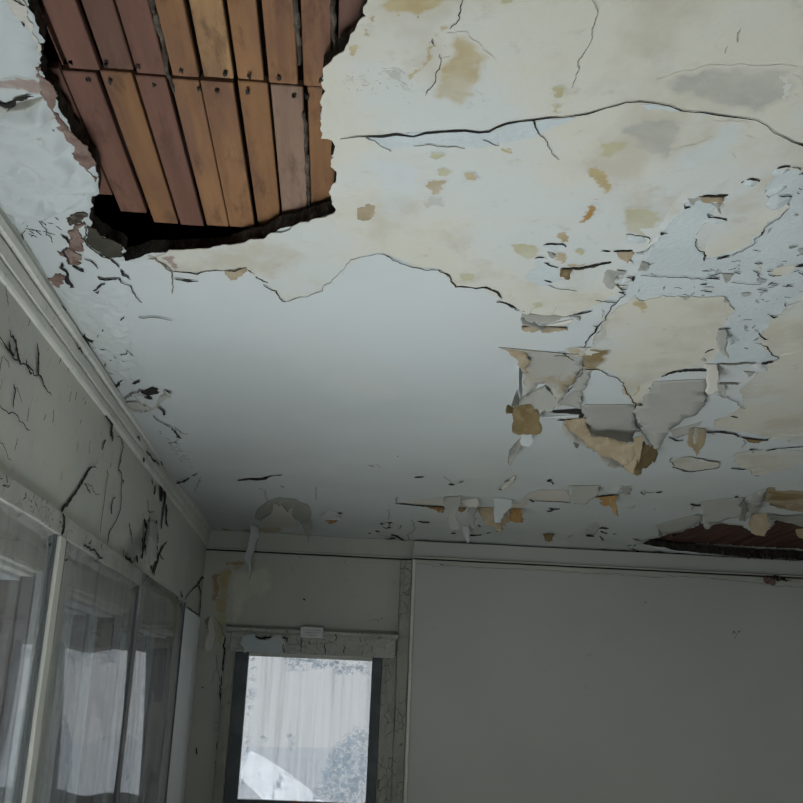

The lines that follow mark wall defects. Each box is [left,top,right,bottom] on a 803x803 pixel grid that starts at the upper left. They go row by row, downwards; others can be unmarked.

leakage [362,0,464,38]
leakage [346,25,494,110]
crack [572,0,598,87]
spalling [0,62,97,182]
crack [342,101,803,160]
crack [84,224,171,321]
crack [173,254,524,312]
peeling [626,166,803,369]
crack [0,320,86,462]
crack [153,407,201,490]
crack [62,415,167,575]
flaking render [763,487,803,527]